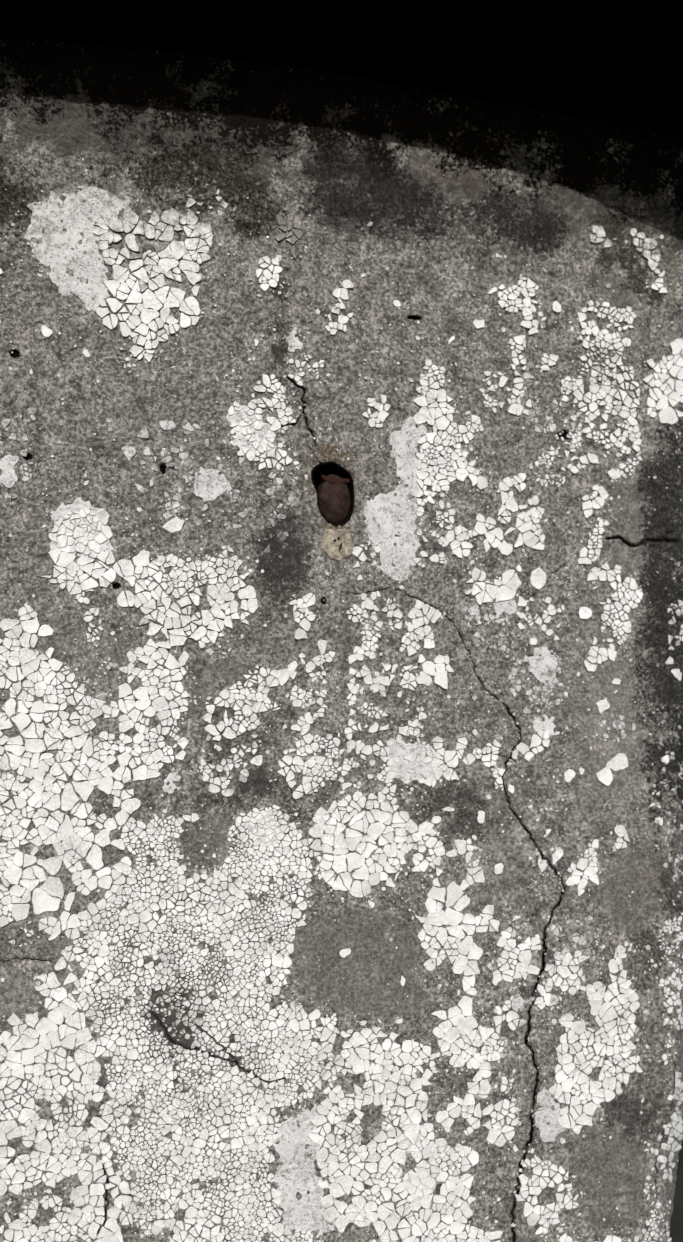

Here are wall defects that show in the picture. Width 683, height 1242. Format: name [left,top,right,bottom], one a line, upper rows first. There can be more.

peeling [92,179,229,362]
peeling [122,354,325,553]
water stain [0,34,683,316]
peeling [362,394,390,428]
peeling [412,277,683,714]
crack [607,531,677,546]
crack [152,1013,284,1083]
peeling [0,509,643,1242]
crack [353,542,566,1242]
peeling [641,704,683,1242]